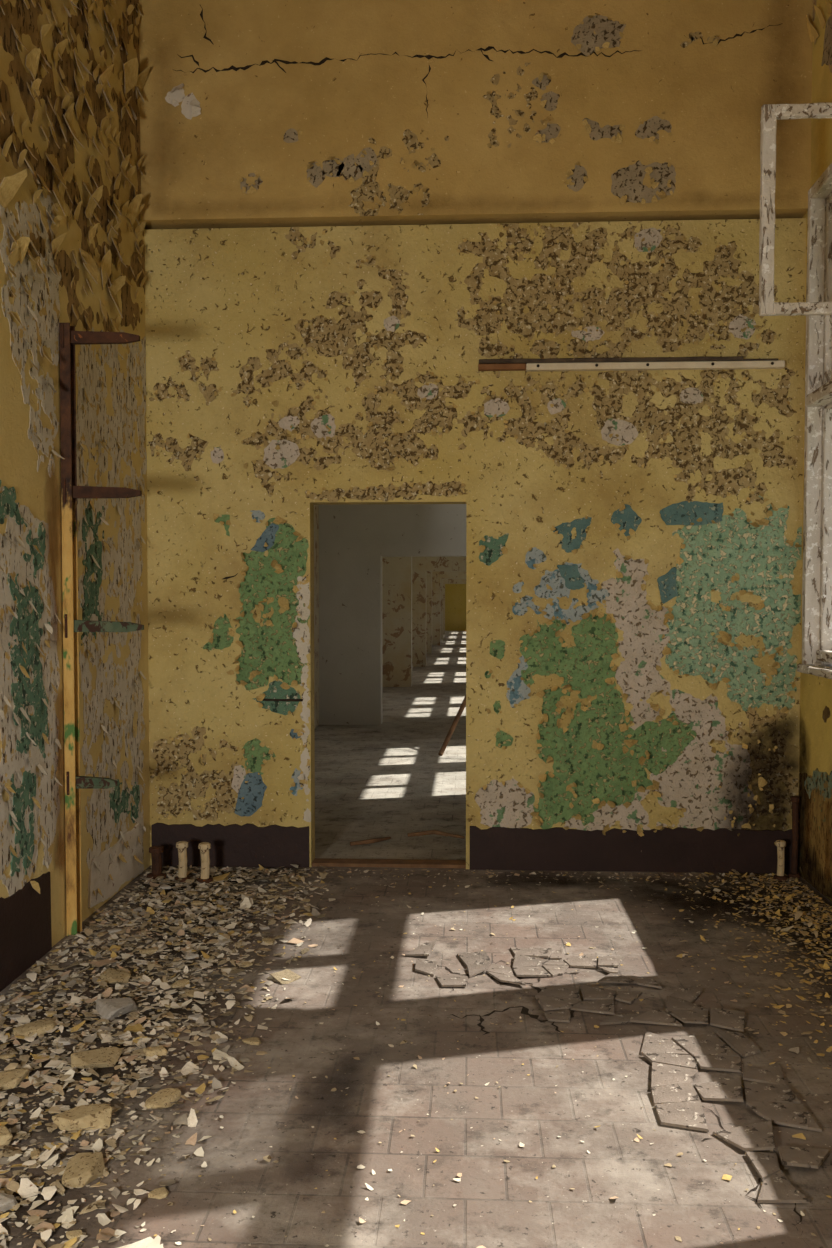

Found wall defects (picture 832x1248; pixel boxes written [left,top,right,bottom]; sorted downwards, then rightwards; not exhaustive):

crack [175,5,638,114]
peeling [0,0,832,945]
leakage [730,721,832,902]
crack [437,960,580,1035]
crack [745,1151,762,1208]